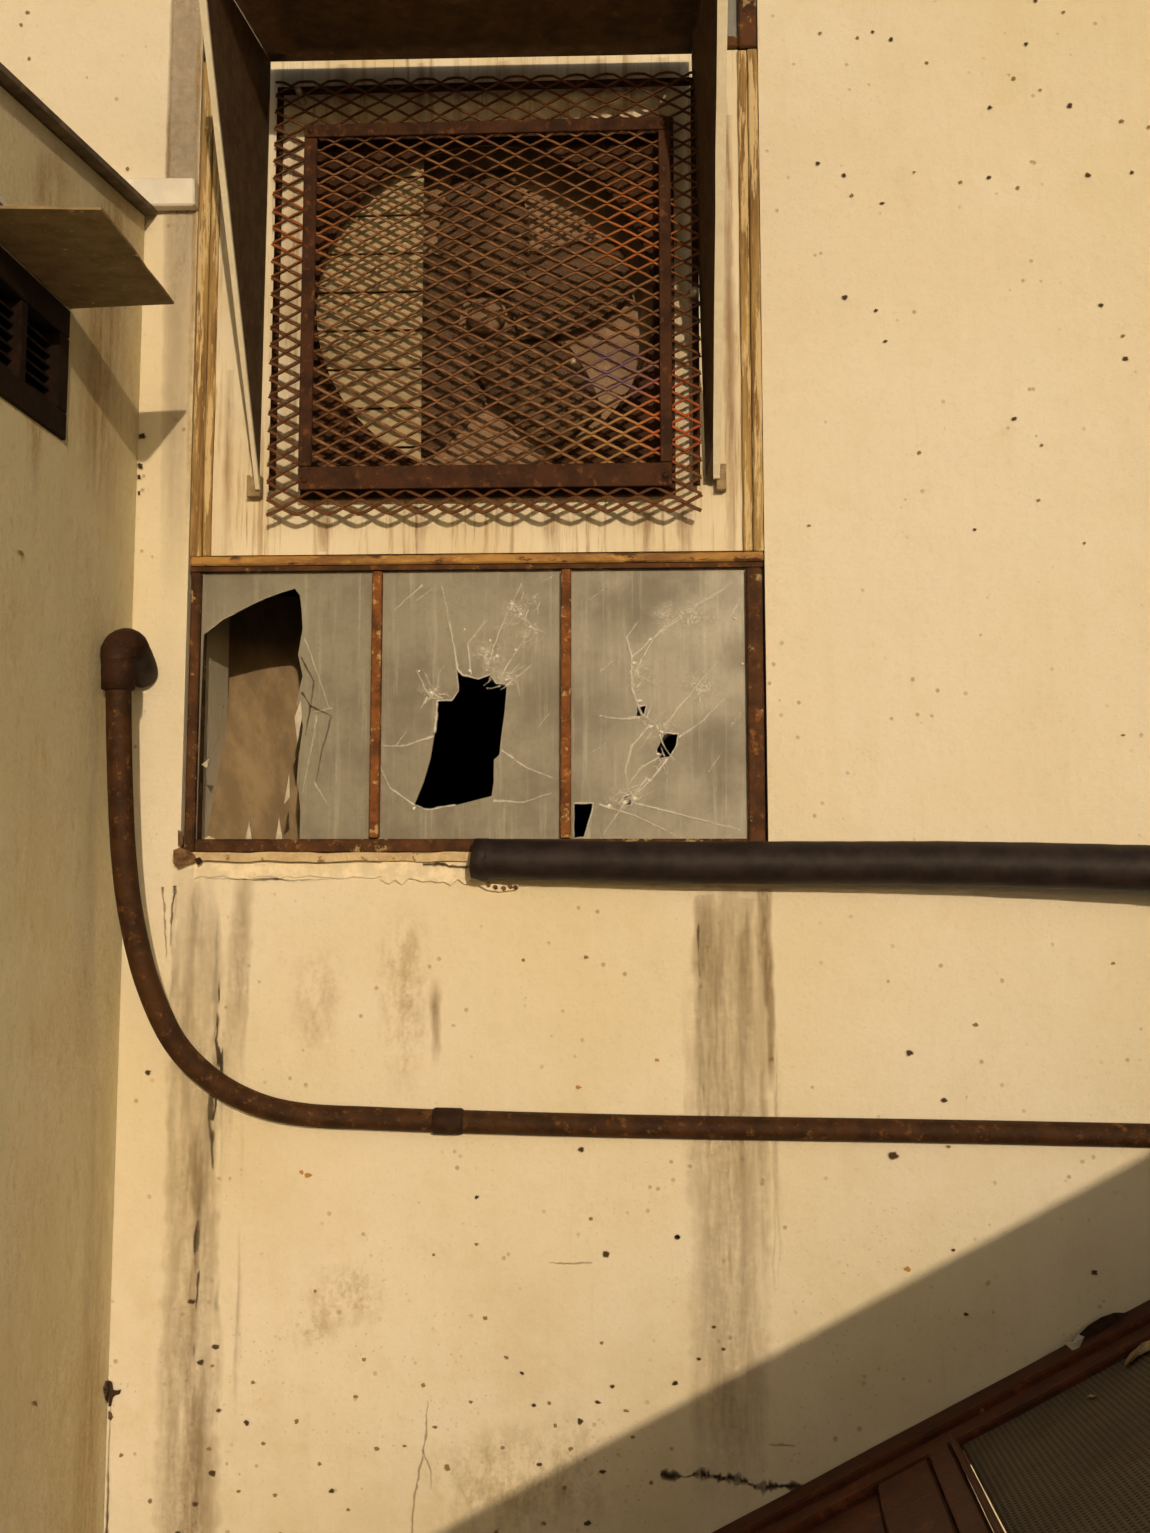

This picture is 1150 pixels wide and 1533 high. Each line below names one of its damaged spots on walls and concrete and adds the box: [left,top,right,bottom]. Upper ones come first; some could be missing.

flaking render [173,830,519,892]
leakage [761,889,773,1057]